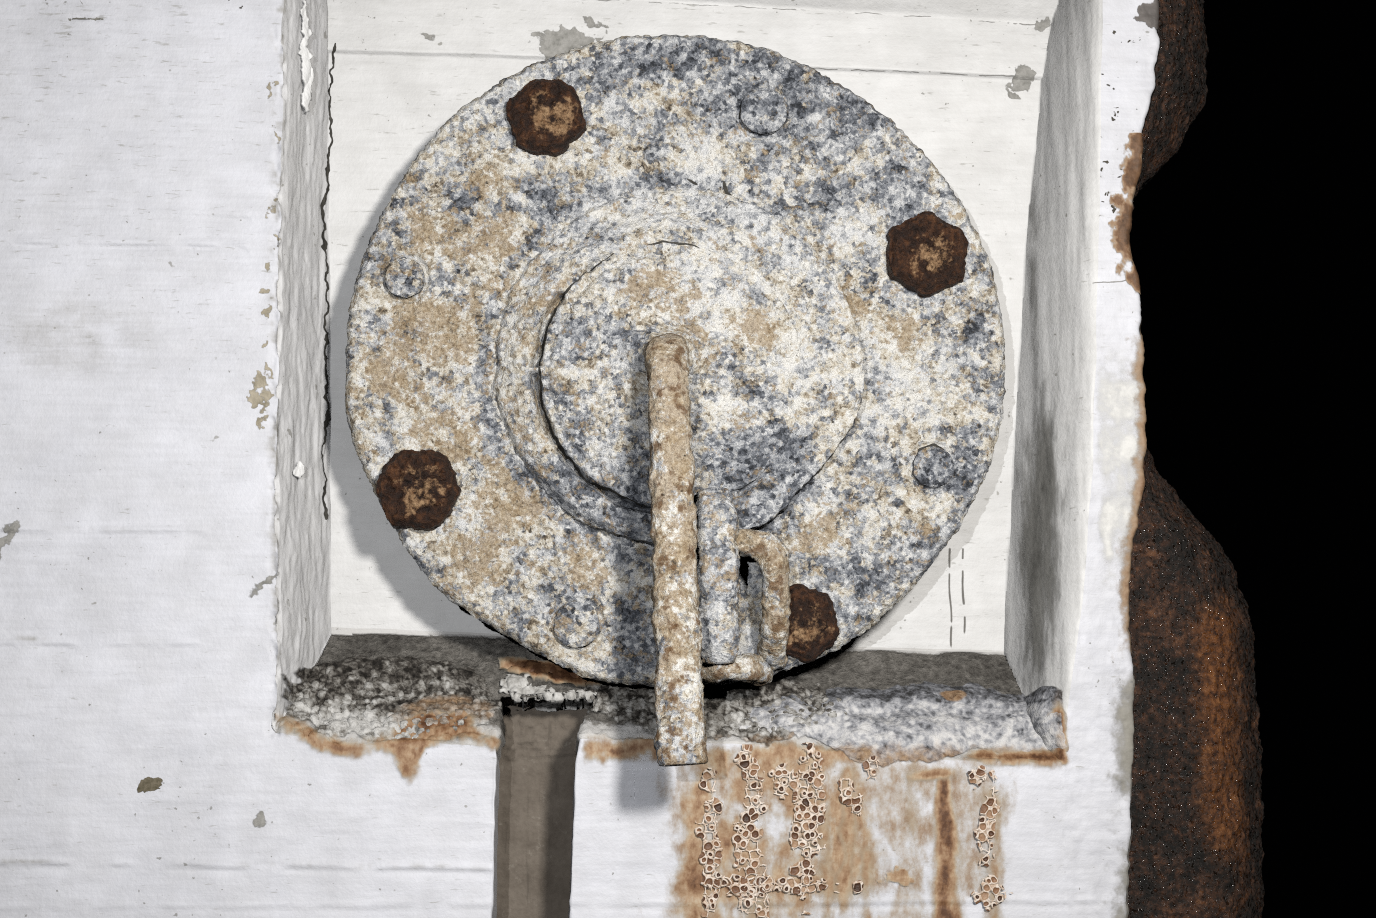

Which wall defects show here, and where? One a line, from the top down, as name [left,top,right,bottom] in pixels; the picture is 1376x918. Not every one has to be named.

spalling [259,262,272,318]
crack [320,43,336,520]
corrosion [1108,132,1144,294]
spalling [246,341,274,429]
corrosion [1119,333,1147,642]
corrosion [274,710,500,778]
corrosion [670,704,1068,918]